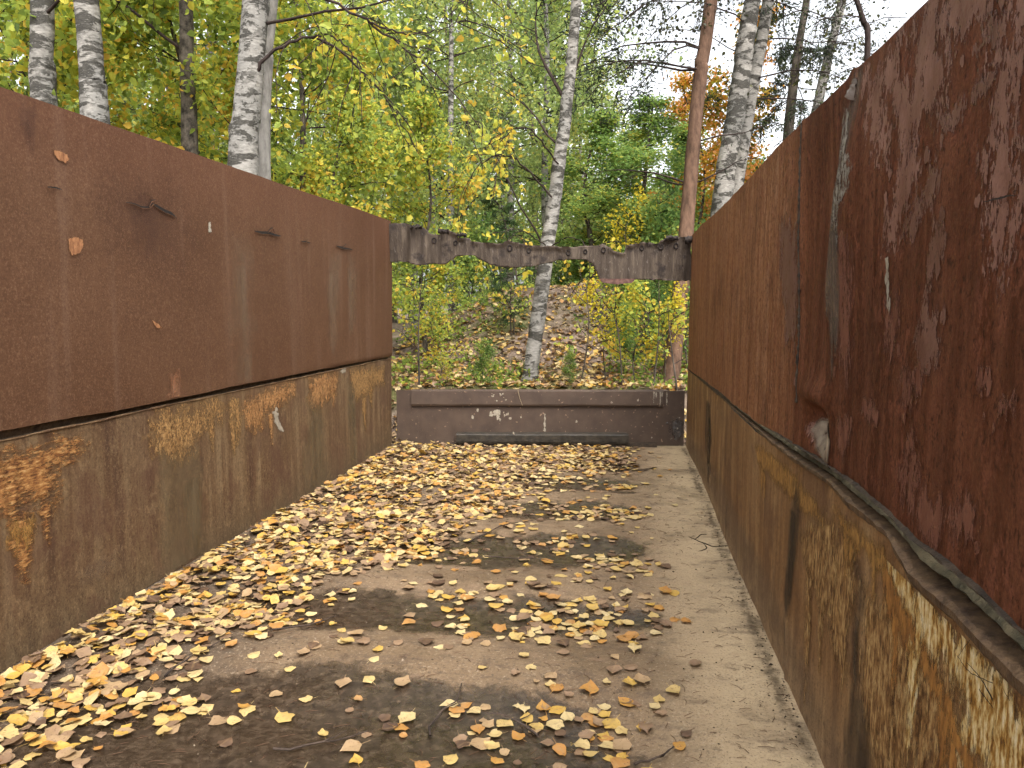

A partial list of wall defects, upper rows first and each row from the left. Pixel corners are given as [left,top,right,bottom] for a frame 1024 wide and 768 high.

peeling [831,209,856,395]
peeling [855,0,1024,555]
rust [0,433,89,585]
rust [148,364,385,468]
peeling [837,397,880,459]
rust [755,445,1024,768]